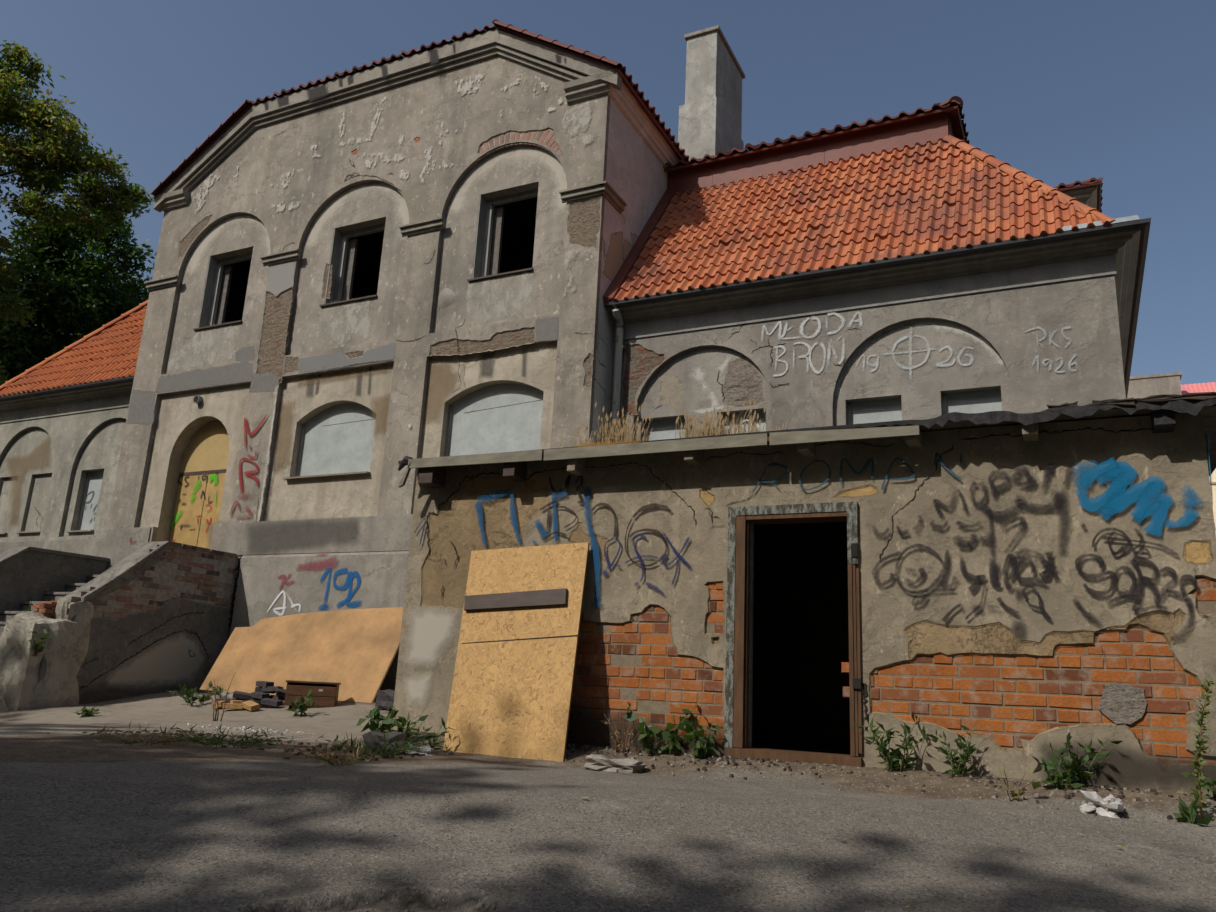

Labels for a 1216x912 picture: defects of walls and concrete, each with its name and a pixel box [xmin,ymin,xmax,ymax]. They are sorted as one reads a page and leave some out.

flaking render [621,344,683,416]
flaking render [32,541,239,623]
crack [79,557,241,690]
crack [425,463,754,596]
flaking render [570,604,725,747]
flaking render [704,581,724,645]
flaking render [841,662,850,698]
crack [879,427,1152,559]
flaking render [868,540,1216,764]